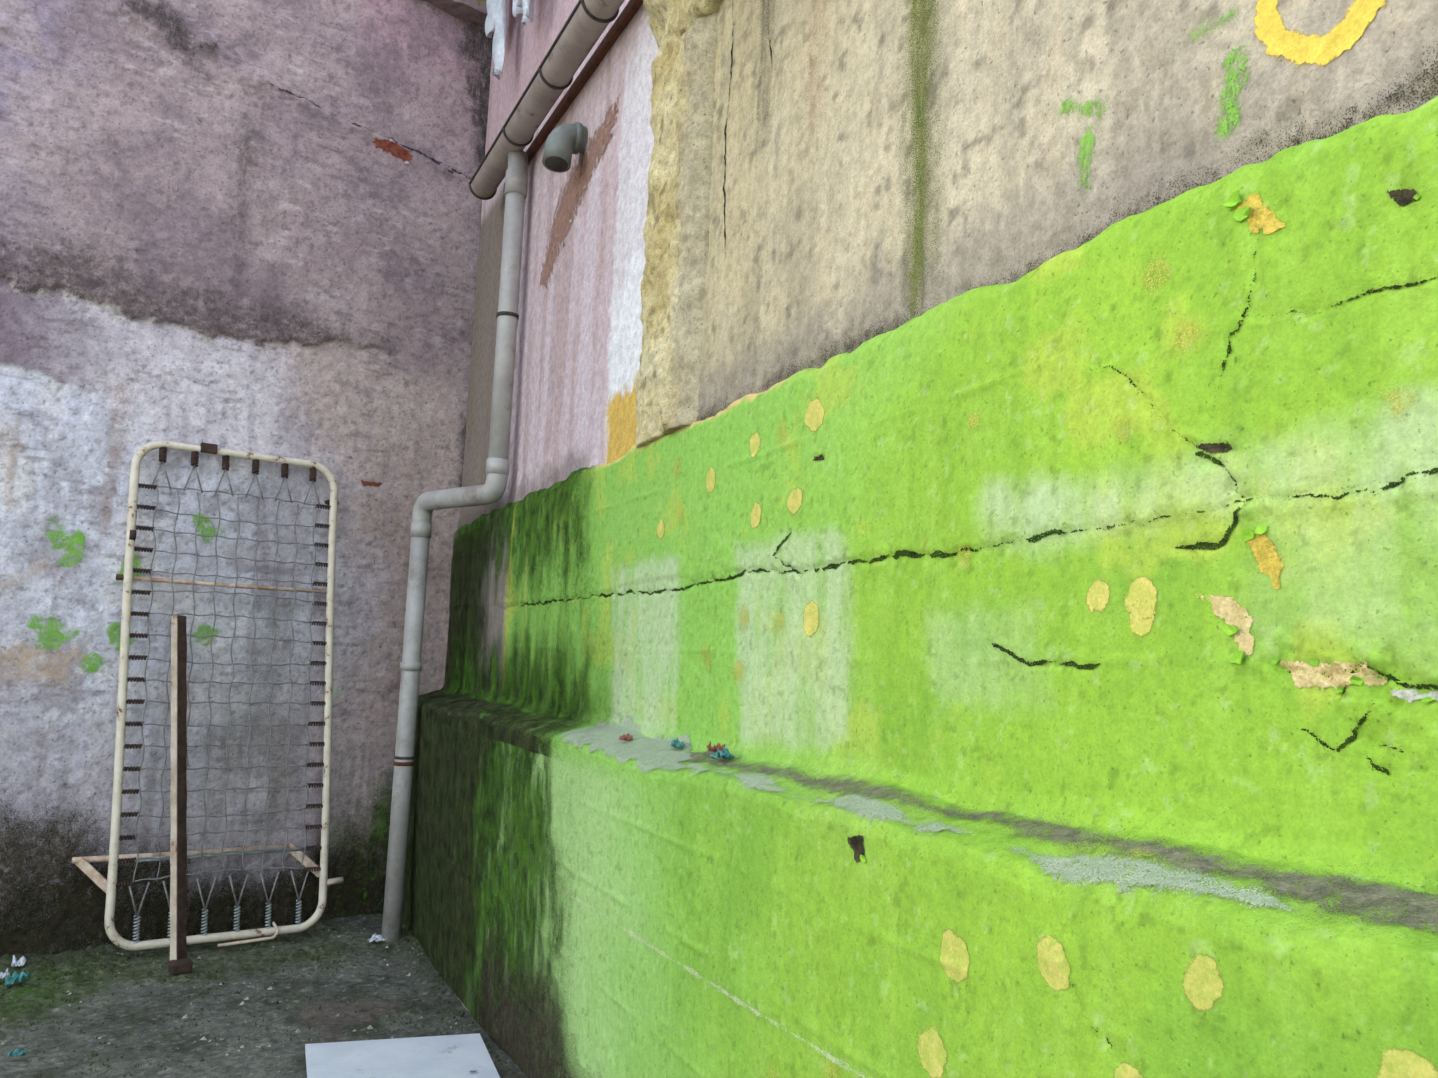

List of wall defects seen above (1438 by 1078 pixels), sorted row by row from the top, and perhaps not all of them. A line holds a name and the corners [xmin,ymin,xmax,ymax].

crack [269,83,471,179]
crack [504,365,1438,609]
leakage [0,584,393,957]
leakage [402,520,623,1031]
crack [991,643,1100,670]
crack [1283,663,1438,775]